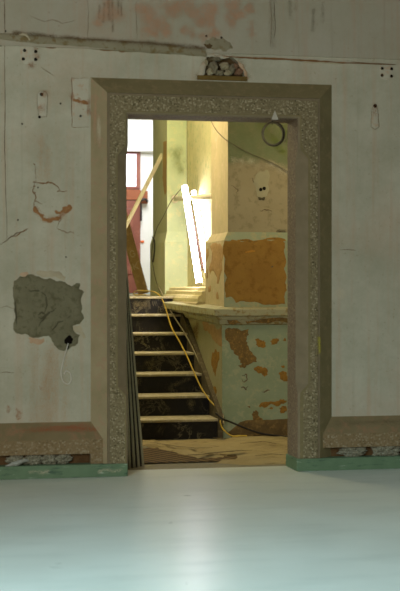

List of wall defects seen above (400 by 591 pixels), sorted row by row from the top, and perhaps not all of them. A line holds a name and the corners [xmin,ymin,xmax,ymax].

spalling [194,35,252,81]
peeling [206,237,287,305]
peeling [202,317,288,377]
peeling [228,399,288,436]